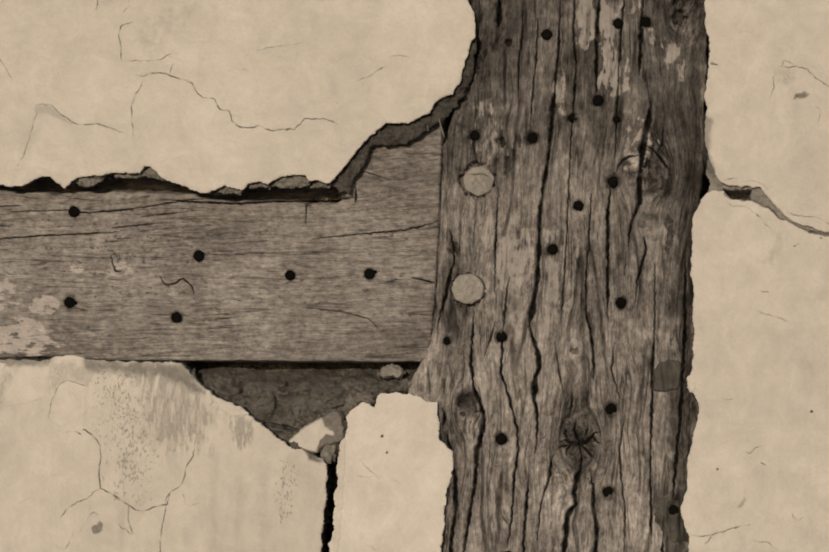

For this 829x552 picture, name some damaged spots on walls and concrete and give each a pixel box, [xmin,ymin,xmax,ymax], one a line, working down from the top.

crack [158,57,333,131]
spalling [205,12,478,196]
spalling [63,166,193,191]
crack [706,160,829,247]
crack [63,429,168,552]
spalling [83,357,420,552]